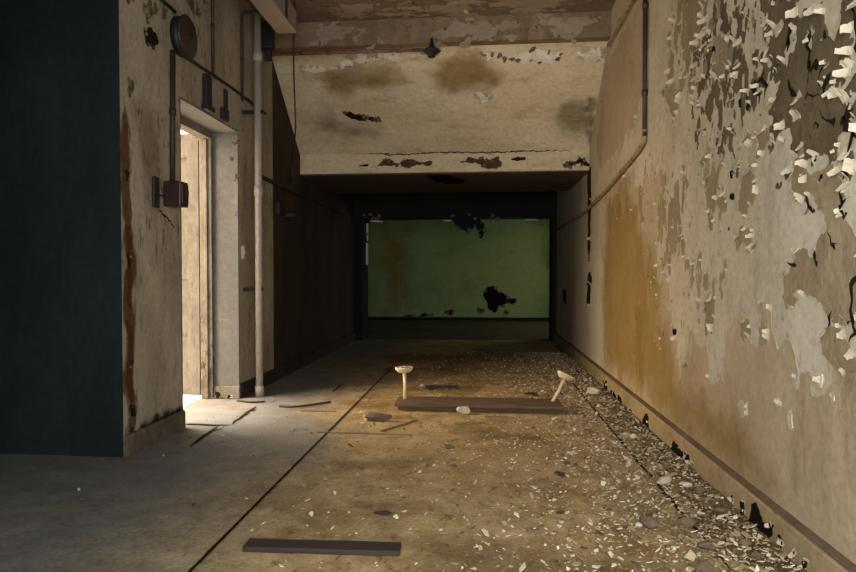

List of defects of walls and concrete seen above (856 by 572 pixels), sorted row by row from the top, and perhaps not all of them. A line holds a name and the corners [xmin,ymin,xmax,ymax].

damp [439,60,496,91]
peeling [298,0,856,570]
damp [605,197,739,453]